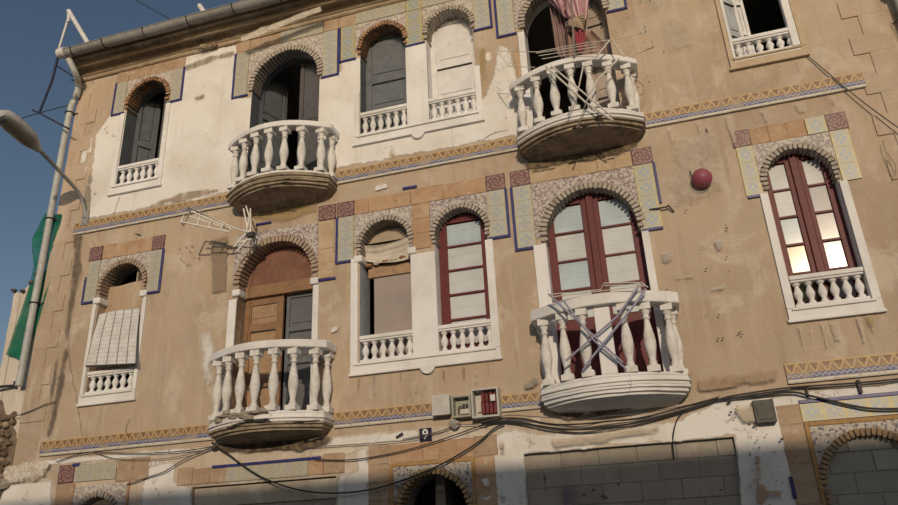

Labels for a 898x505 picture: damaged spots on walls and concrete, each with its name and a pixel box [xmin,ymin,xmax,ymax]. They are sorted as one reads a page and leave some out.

peeling [485,46,522,99]
damp [68,235,81,308]
damp [47,349,67,435]
peeling [0,411,49,483]
peeling [552,426,659,446]
peeling [730,405,786,505]